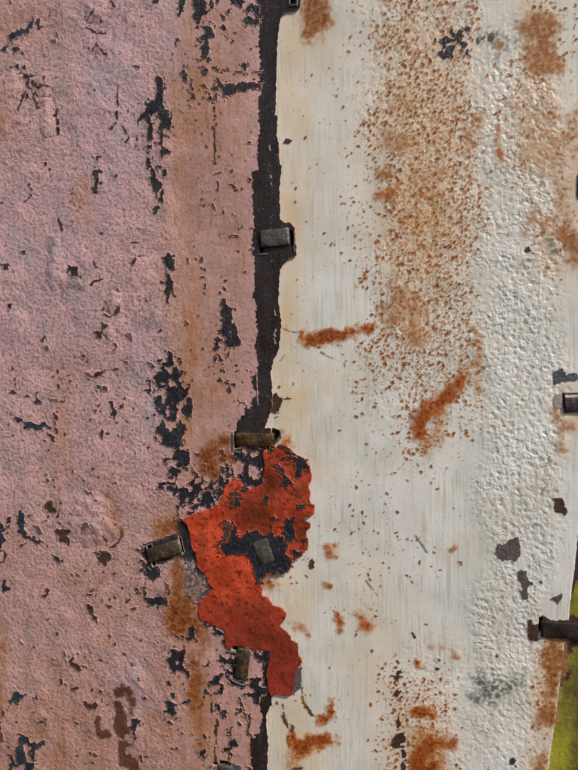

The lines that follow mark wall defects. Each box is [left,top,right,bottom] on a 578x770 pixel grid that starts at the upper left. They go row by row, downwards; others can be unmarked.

peeling [137,73,177,215]
peeling [186,256,207,289]
peeling [212,285,259,408]
corrosion [198,435,233,480]
peeling [125,350,315,616]
corrosion [163,557,209,644]
peeling [0,690,39,742]
peeling [7,733,49,770]
corrosion [287,694,349,770]
corrosion [367,649,467,770]
corrosion [527,742,548,770]
corrosion [530,629,567,740]